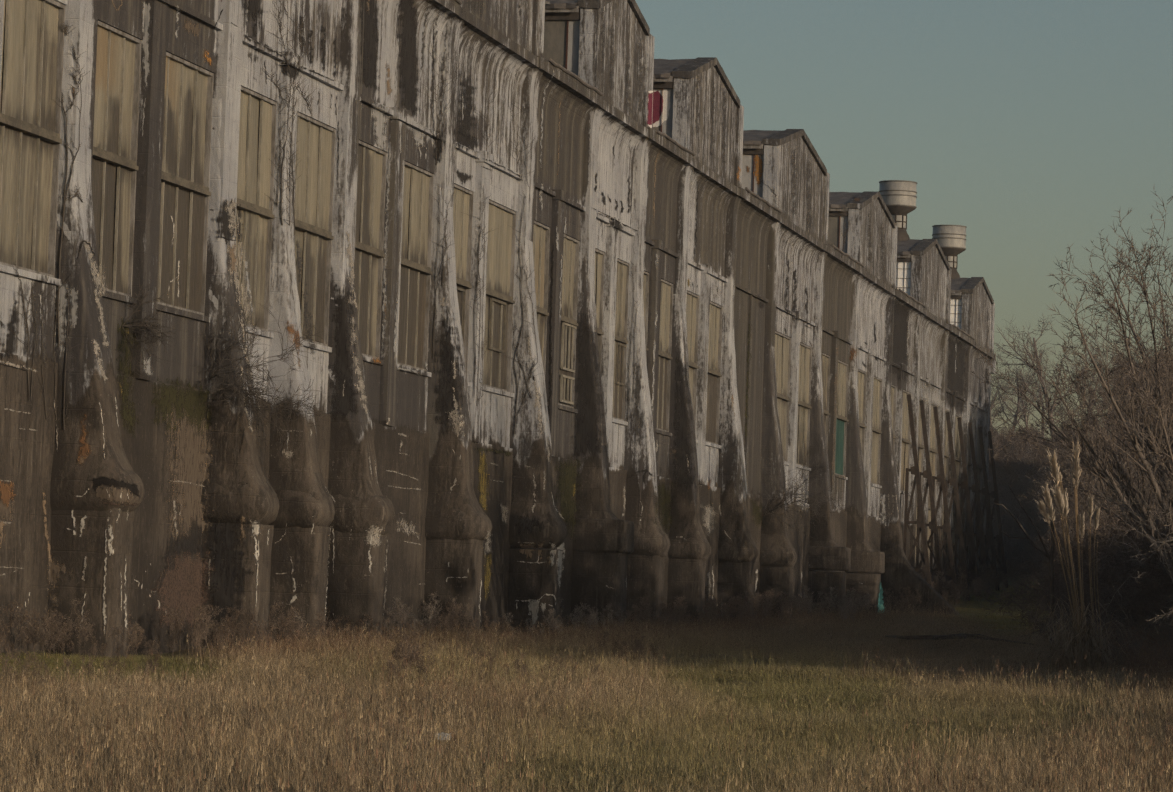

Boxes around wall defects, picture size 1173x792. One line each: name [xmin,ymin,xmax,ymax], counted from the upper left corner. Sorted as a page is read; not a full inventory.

damp [243,10,285,84]
damp [421,7,448,163]
peeling [54,282,78,357]
peeling [84,240,109,381]